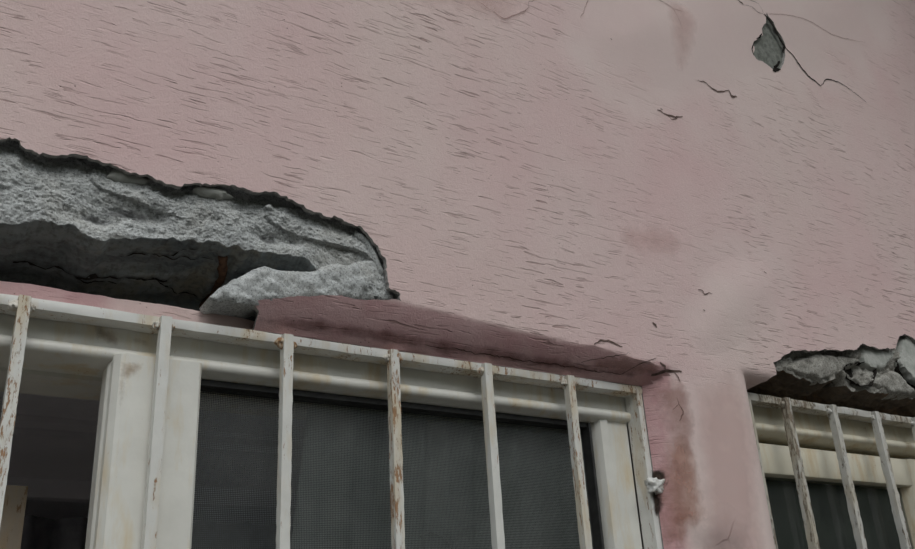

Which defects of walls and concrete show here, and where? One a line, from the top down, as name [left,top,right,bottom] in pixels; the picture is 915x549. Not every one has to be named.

flaking render [753,19,783,69]
crack [738,0,866,102]
flaking render [0,139,398,321]
crack [13,249,213,297]
flaking render [747,335,915,418]